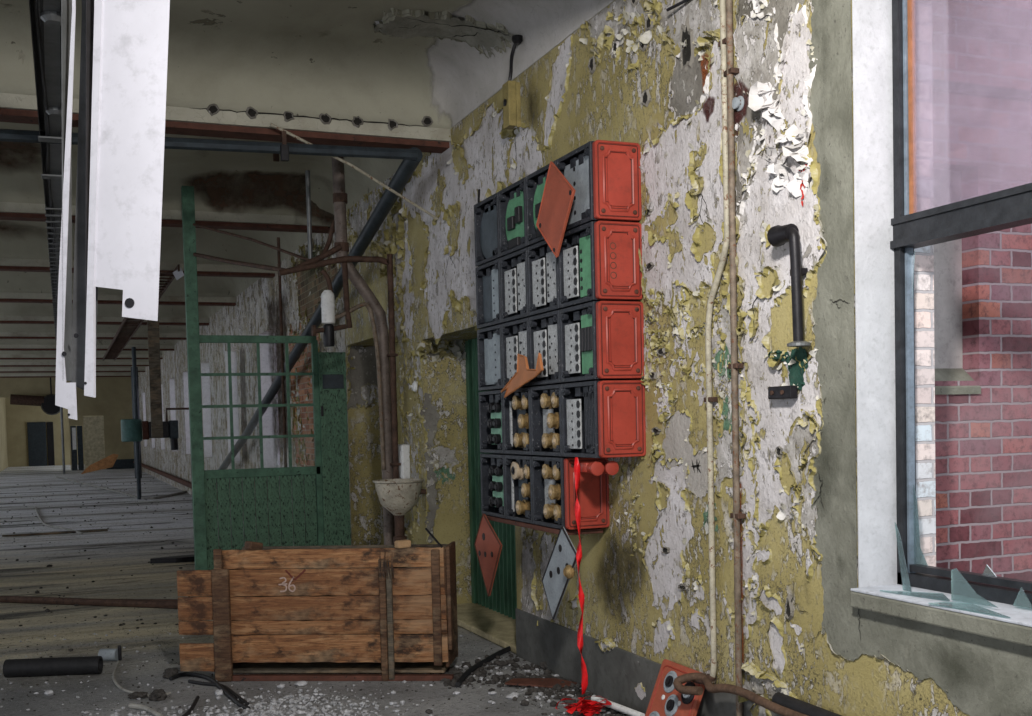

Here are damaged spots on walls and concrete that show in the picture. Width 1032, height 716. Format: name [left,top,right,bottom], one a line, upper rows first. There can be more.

leakage [188,171,334,223]
peeling [347,172,396,242]
peeling [367,0,827,716]